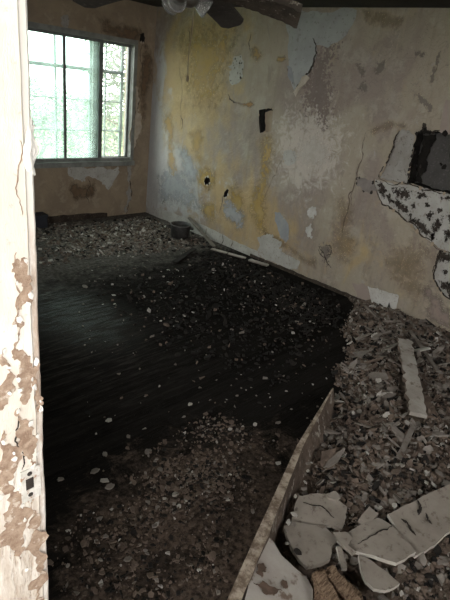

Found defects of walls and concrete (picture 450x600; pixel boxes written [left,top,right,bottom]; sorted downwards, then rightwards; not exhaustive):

peeling [286,7,357,133]
crack [15,141,23,215]
flaking render [68,166,119,190]
flaking render [147,206,300,269]
spalling [305,206,317,239]
crack [318,133,366,268]
flaking render [356,127,450,300]
flaking render [352,283,399,309]
peeling [0,257,49,600]